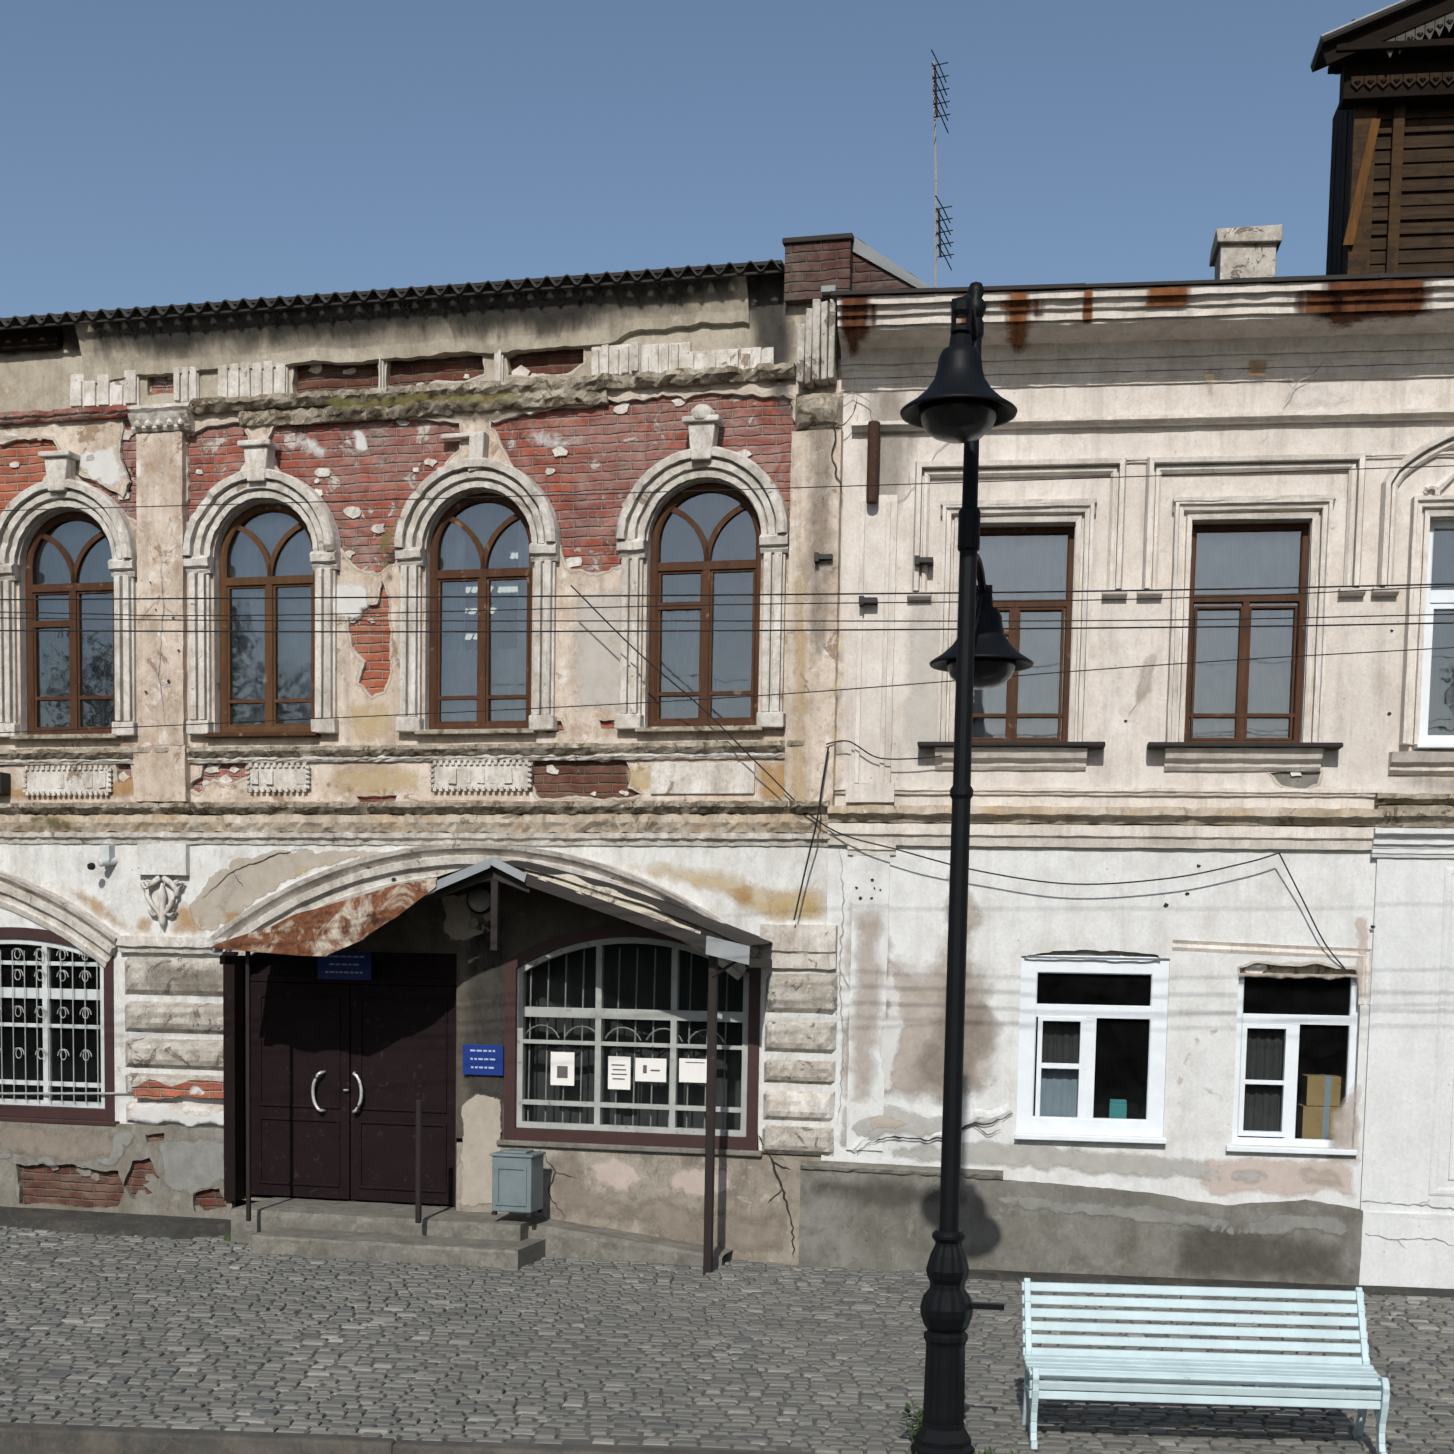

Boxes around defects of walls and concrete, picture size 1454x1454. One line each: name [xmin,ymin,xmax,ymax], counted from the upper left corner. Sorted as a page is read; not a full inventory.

corrosion [841,297,876,355]
corrosion [1002,292,1042,349]
corrosion [1297,279,1428,328]
flaking render [0,436,60,515]
flaking render [489,389,800,576]
flaking render [186,356,486,737]
crack [204,849,297,897]
water stain [967,893,979,930]
water stain [844,915,947,1102]
water stain [963,963,997,1089]
flaking render [0,1079,227,1211]
crack [1361,1199,1454,1248]